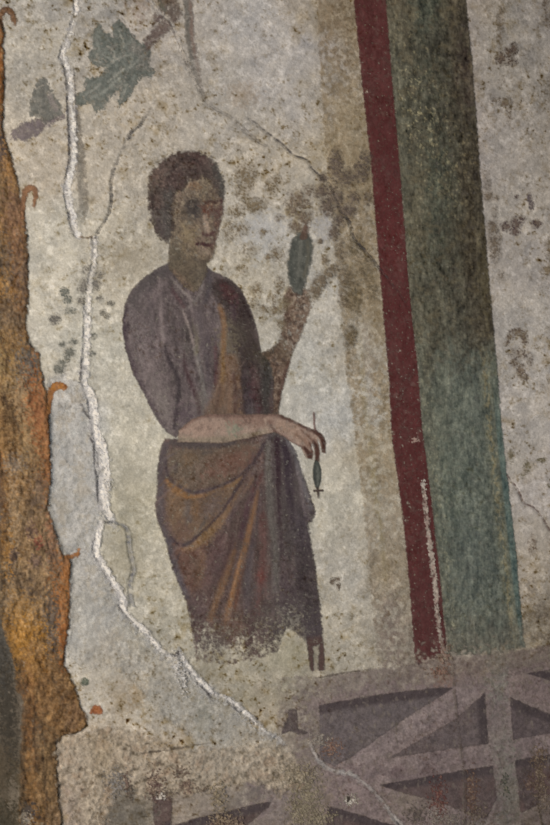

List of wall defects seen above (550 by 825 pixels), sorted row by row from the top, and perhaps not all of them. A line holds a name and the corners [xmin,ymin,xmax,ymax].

crack [249,121,332,188]
crack [345,216,388,278]
crack [59,0,274,737]
peeling [421,479,453,678]
spalling [54,727,362,825]
crack [313,752,367,806]